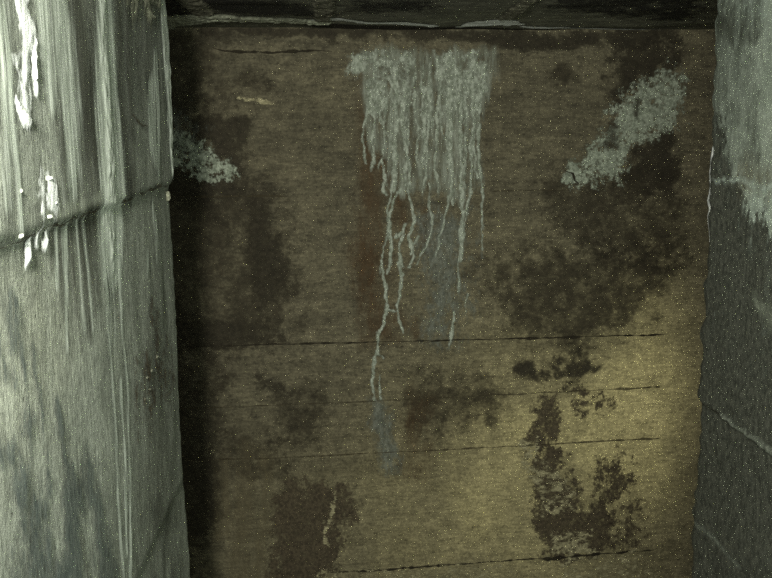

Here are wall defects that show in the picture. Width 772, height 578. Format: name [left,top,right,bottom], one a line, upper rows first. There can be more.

damp [165,0,190,17]
damp [0,0,136,578]
damp [168,33,299,548]
damp [201,0,772,578]
crack [316,561,514,578]
crack [559,548,659,578]